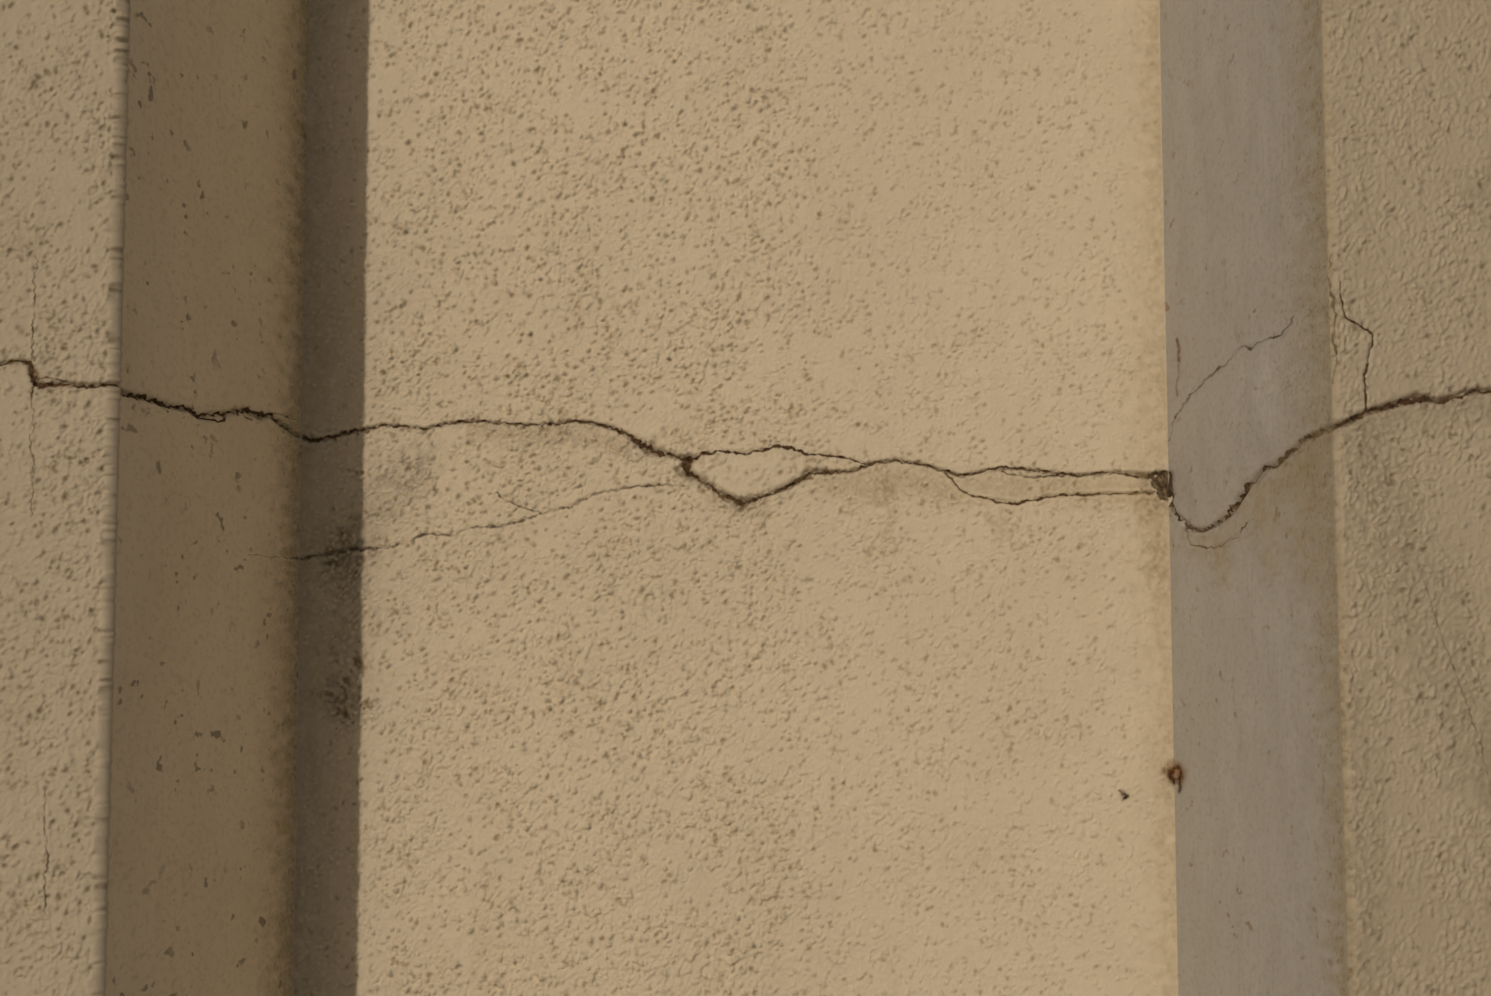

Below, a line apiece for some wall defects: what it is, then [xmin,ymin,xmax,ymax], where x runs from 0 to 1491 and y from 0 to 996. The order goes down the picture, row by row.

crack [0,264,1491,551]
corrosion [1163,764,1183,793]